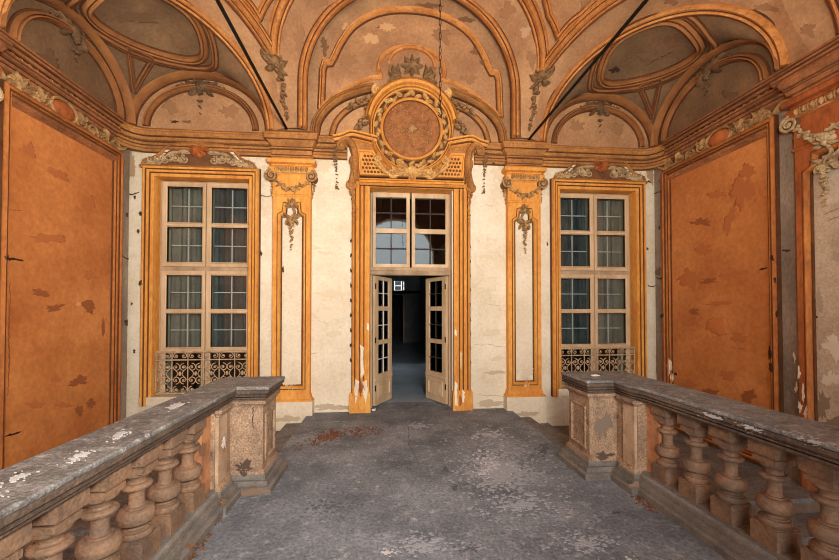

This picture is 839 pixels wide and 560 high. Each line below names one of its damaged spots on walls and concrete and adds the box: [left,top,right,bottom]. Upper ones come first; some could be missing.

peeling [350,343,368,403]
spalling [819,333,839,387]